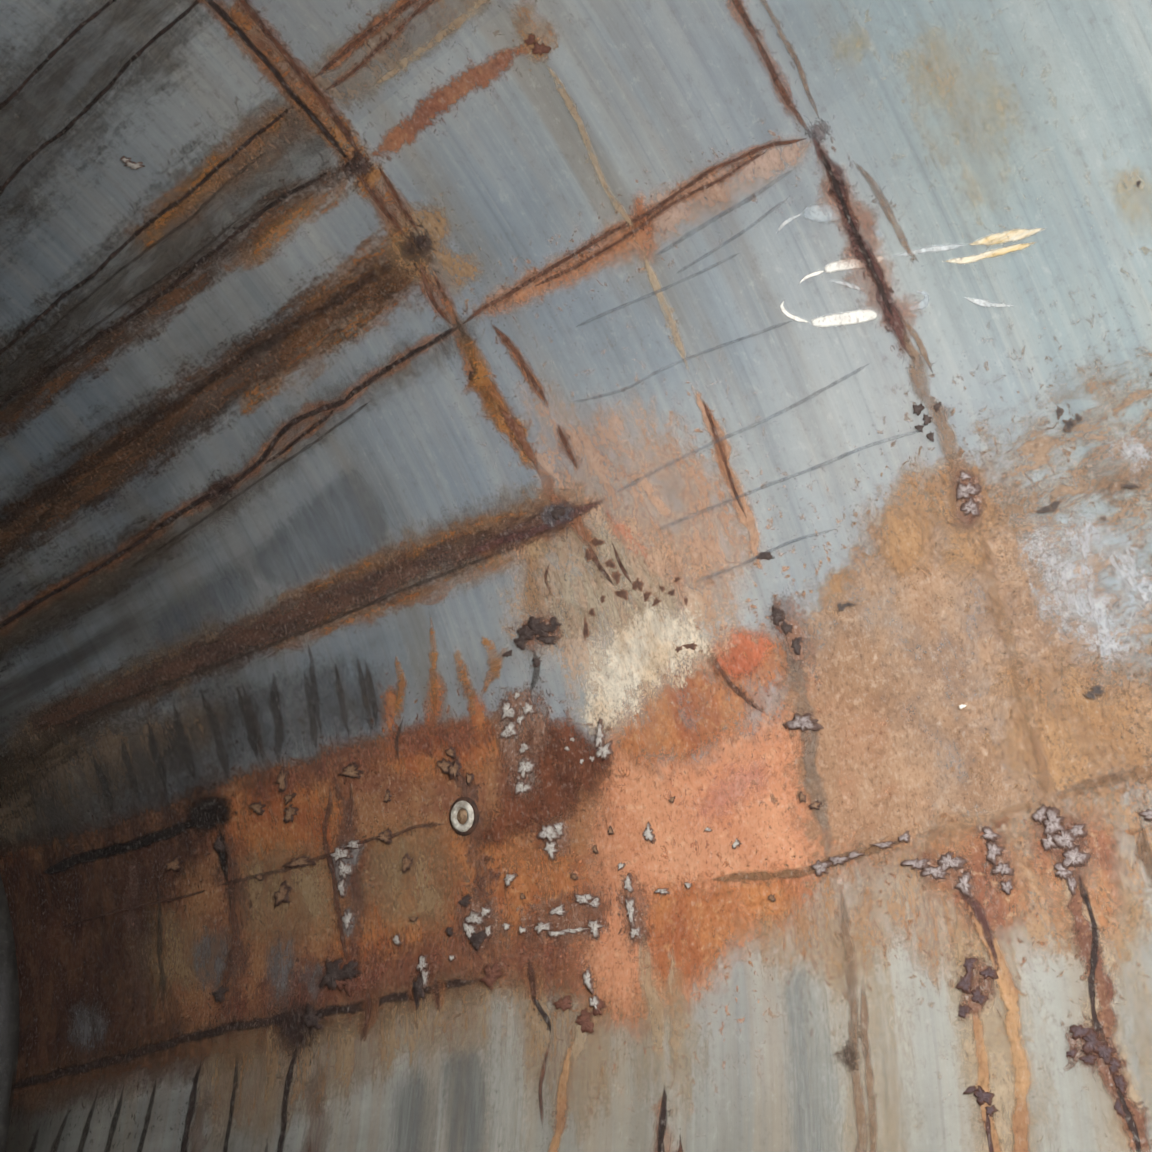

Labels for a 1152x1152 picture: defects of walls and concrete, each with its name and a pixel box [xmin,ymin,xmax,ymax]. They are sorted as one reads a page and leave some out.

corrosion [308,0,485,105]
corrosion [366,5,558,160]
crack [0,0,601,637]
corrosion [464,139,804,324]
crack [697,393,775,567]
corrosion [0,359,1152,1152]
crack [770,595,828,828]
peeling [267,762,364,1031]
peeling [413,954,430,1001]
peeling [445,862,669,962]
peeling [583,967,600,1012]
crack [713,813,1002,1152]